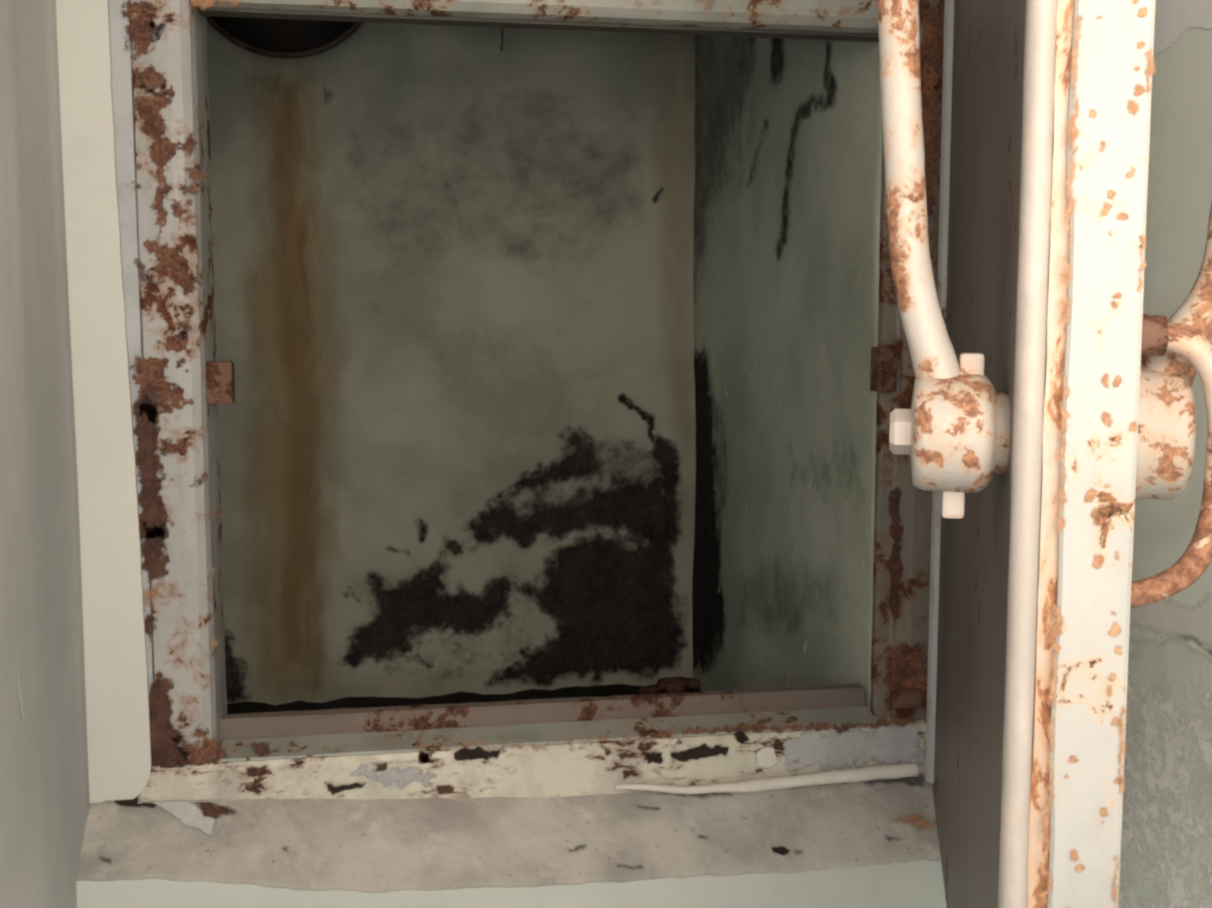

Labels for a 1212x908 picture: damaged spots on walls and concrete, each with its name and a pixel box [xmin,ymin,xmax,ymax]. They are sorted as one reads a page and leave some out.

corrosion [190,0,241,8]
corrosion [919,7,943,219]
corrosion [121,1,207,641]
water stain [343,350,726,686]
corrosion [149,672,228,768]
corrosion [251,742,272,756]
corrosion [325,742,534,795]
corrosion [597,487,928,779]
peeling [616,747,919,794]
peeling [1118,595,1212,908]